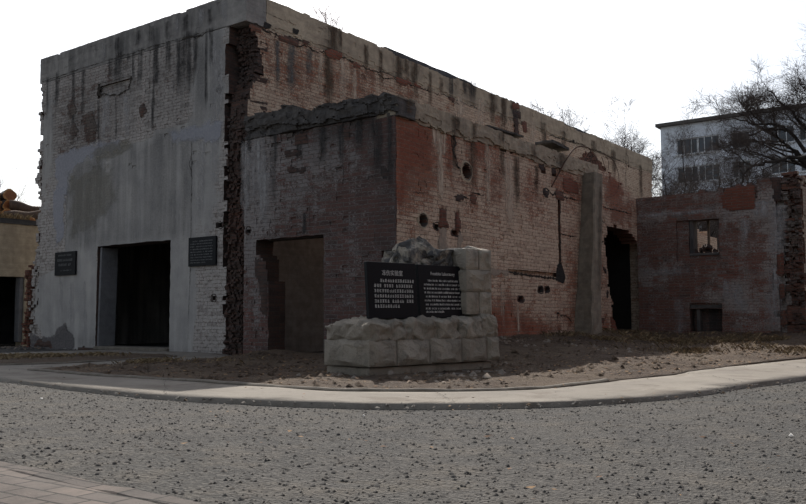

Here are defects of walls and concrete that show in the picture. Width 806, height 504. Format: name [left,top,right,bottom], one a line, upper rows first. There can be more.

leakage [151,15,223,122]
crack [42,11,489,116]
leakage [307,26,357,99]
spalling [30,323,94,350]